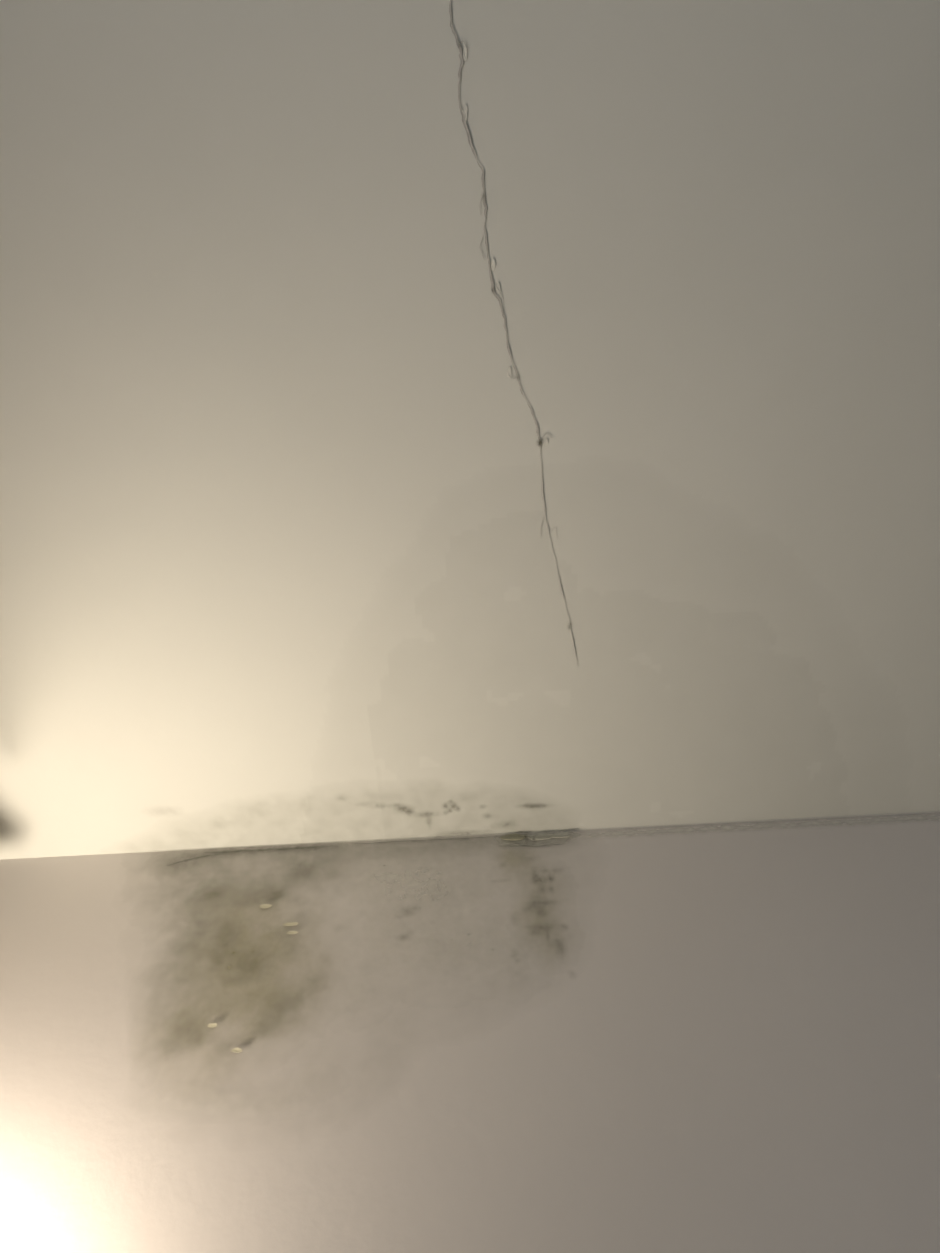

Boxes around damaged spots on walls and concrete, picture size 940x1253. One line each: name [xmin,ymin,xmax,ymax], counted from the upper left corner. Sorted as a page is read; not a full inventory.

crack [449,0,578,666]